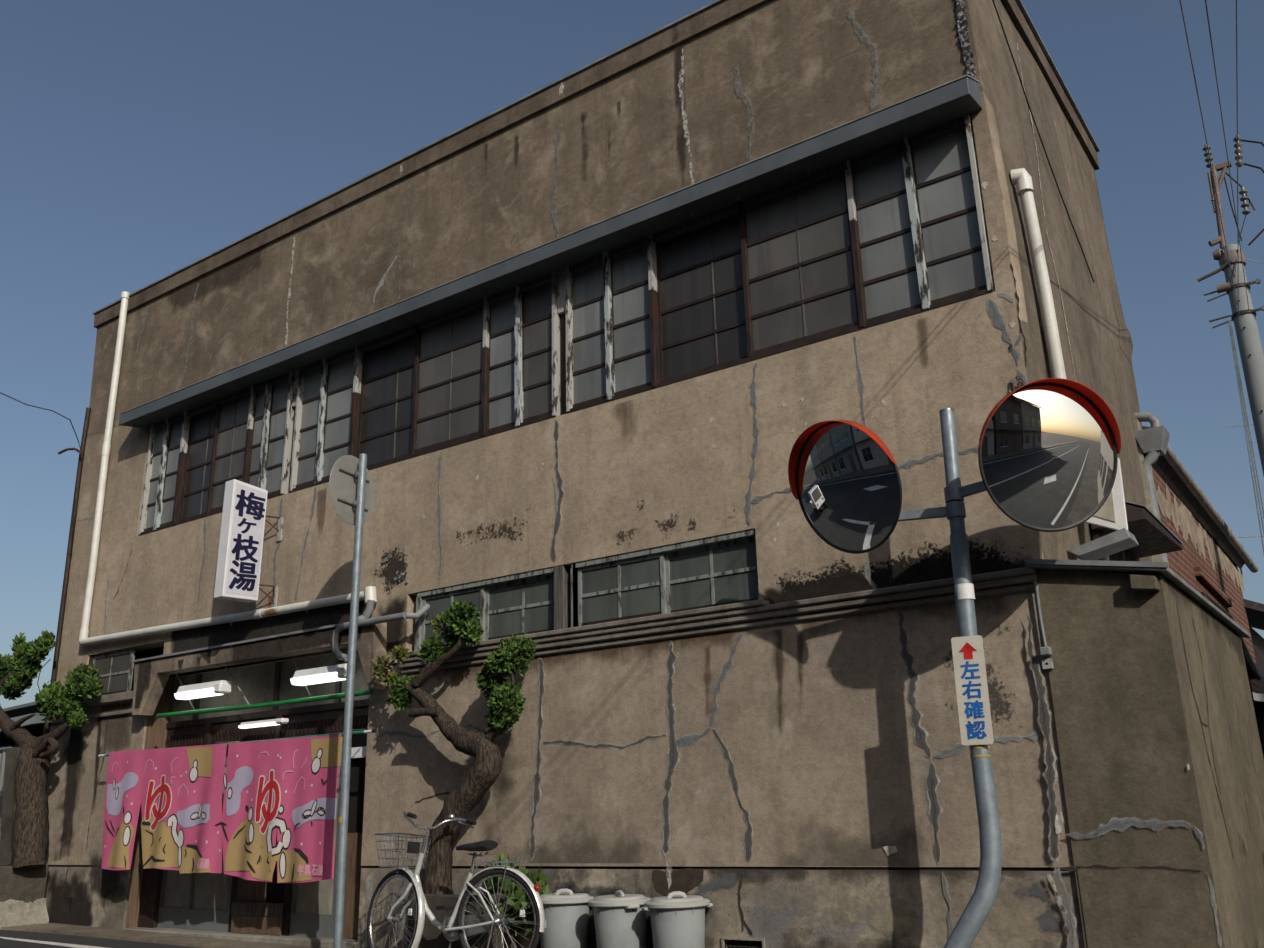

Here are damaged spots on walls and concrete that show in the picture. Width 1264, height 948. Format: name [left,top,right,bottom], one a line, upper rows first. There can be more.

crack [550,81,564,238]
crack [678,49,694,184]
crack [847,9,880,110]
spalling [956,0,977,78]
crack [550,419,565,561]
crack [744,363,791,525]
damp [765,541,953,604]
crack [865,560,877,589]
crack [897,446,978,469]
damp [969,535,1027,575]
crack [529,633,754,935]
crack [897,607,1252,948]